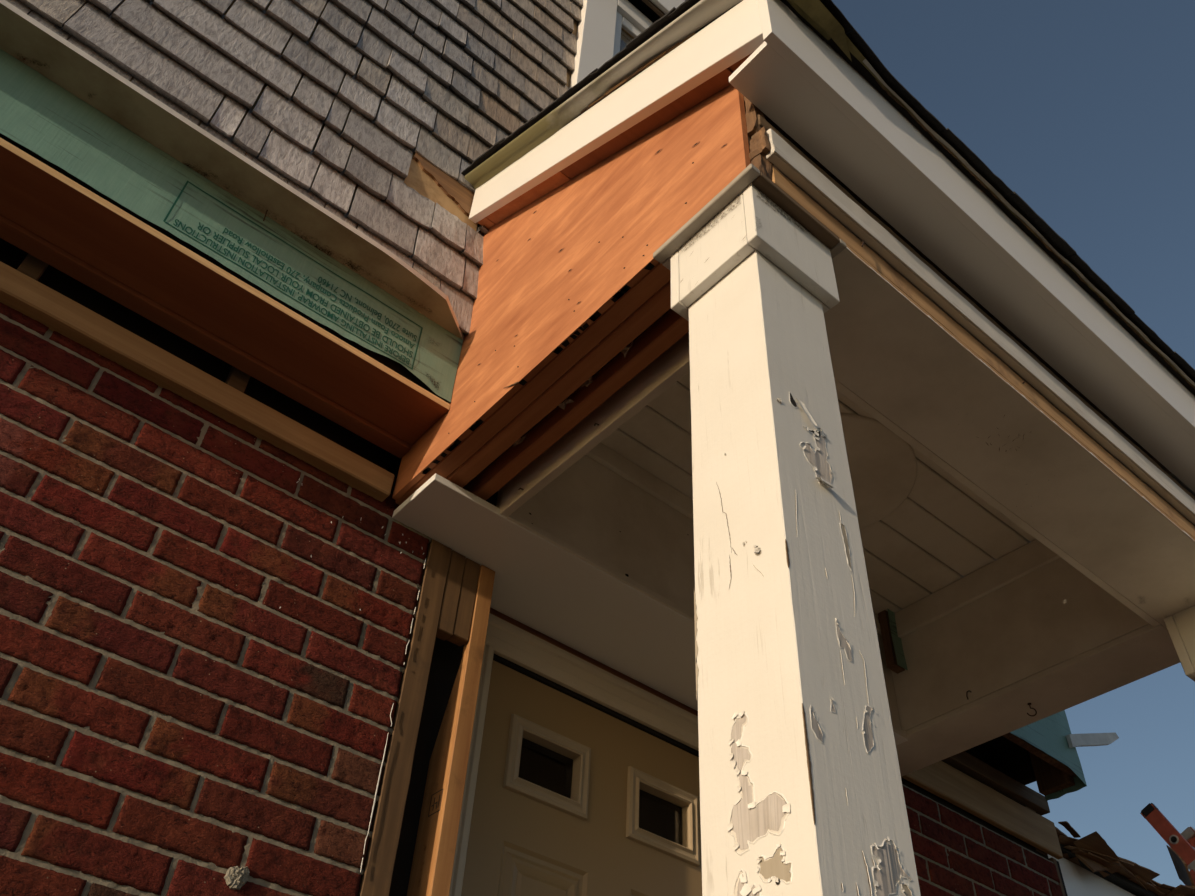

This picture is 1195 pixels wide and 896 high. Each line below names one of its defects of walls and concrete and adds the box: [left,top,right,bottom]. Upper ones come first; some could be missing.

peeling [777,391,838,490]
peeling [727,710,793,896]
peeling [802,697,837,825]
peeling [870,837,913,896]